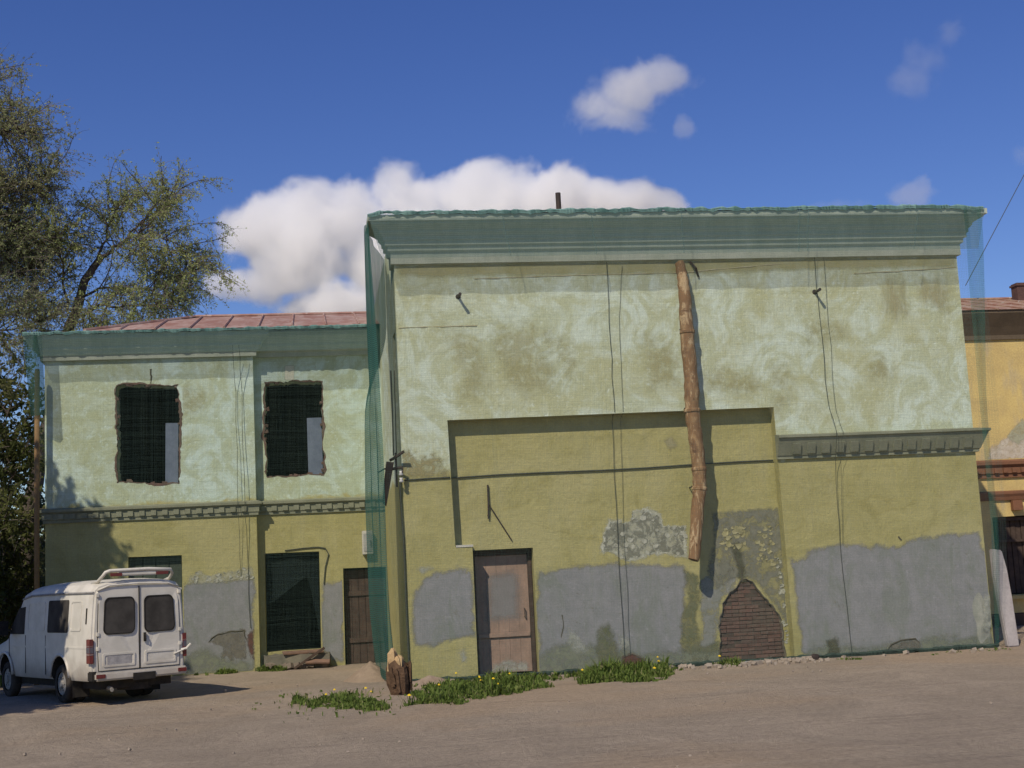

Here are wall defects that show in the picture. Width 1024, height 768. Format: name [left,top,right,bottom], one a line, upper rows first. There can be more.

peeling [600,508,688,561]
flaking render [208,629,254,660]
flaking render [718,578,787,660]